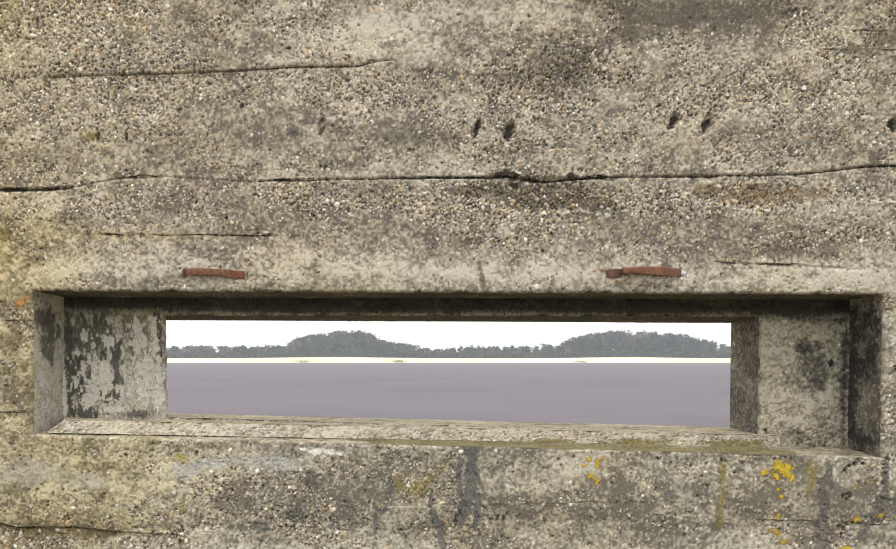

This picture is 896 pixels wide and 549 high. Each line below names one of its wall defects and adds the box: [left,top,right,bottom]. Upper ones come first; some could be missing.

crack [130,59,388,75]
crack [0,184,82,192]
crack [269,165,896,188]
leakage [40,312,123,418]
leakage [123,409,147,419]
leakage [455,446,481,530]